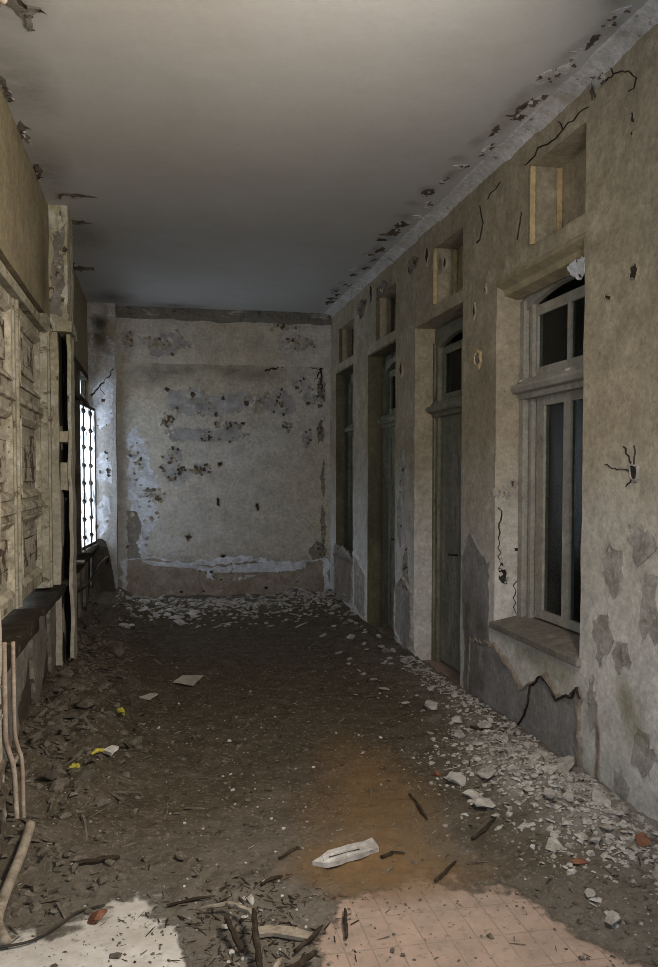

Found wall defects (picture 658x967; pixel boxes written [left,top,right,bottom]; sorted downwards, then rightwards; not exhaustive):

peeling [506,5,632,121]
crack [606,68,637,92]
crack [525,107,589,165]
peeling [325,177,450,305]
peeling [567,257,585,280]
peeling [120,327,193,357]
peeling [92,378,114,430]
crack [604,445,636,487]
peeling [96,450,113,539]
spalling [119,376,367,622]
crack [517,676,581,725]